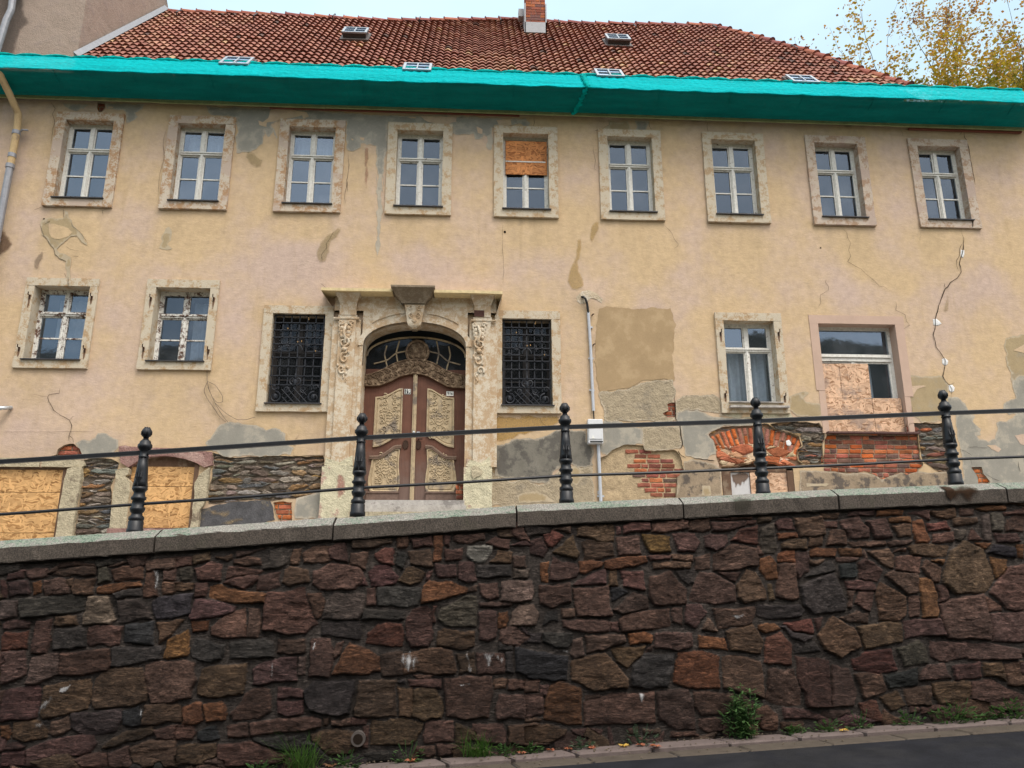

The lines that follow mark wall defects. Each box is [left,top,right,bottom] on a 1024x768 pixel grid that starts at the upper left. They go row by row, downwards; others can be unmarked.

flaking render [206,106,530,255]
flaking render [40,210,87,278]
crack [933,221,973,401]
crack [39,390,80,438]
flaking render [492,334,1024,506]
flaking render [53,433,119,536]
flaking render [206,422,325,524]